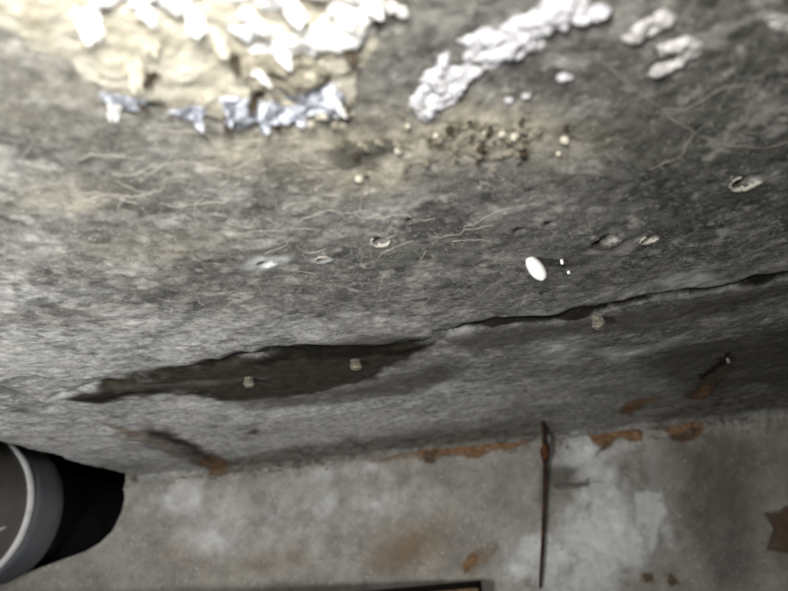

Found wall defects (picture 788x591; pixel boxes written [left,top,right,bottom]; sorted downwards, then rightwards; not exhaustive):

peeling [0,0,408,137]
spalling [329,139,404,183]
spalling [425,114,543,172]
spalling [556,124,570,156]
crack [676,271,788,292]
crack [169,295,650,369]
leakage [67,338,452,406]
rust [371,441,528,463]
rust [589,429,642,454]
rust [666,422,704,442]
rust [765,507,788,553]